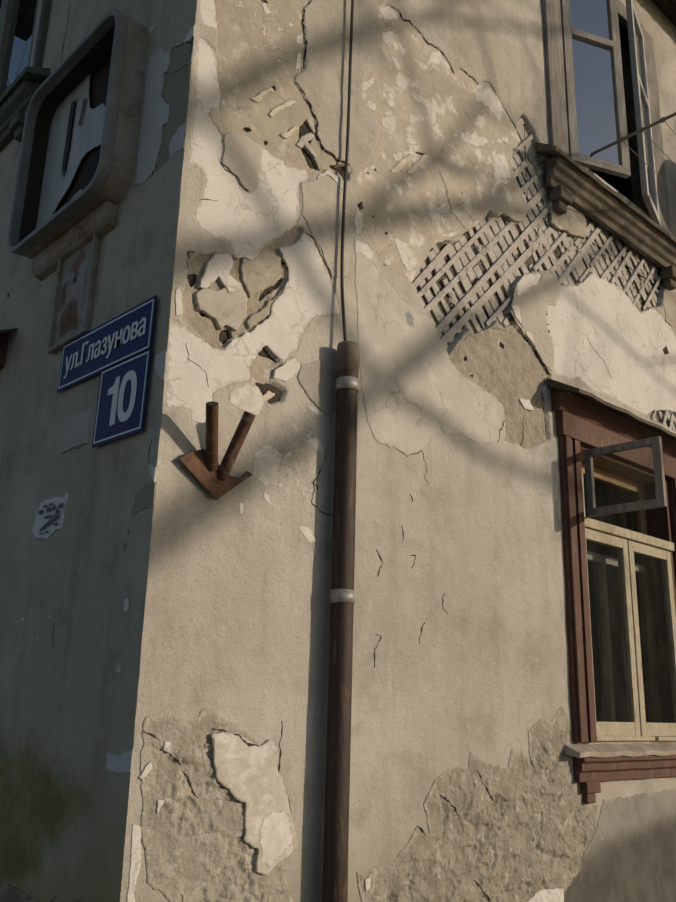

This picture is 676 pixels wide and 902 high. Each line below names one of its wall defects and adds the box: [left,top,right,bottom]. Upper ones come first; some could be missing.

peeling [134,0,676,484]
peeling [252,422,325,515]
peeling [299,512,320,559]
spalling [127,708,297,902]
spalling [356,706,604,902]